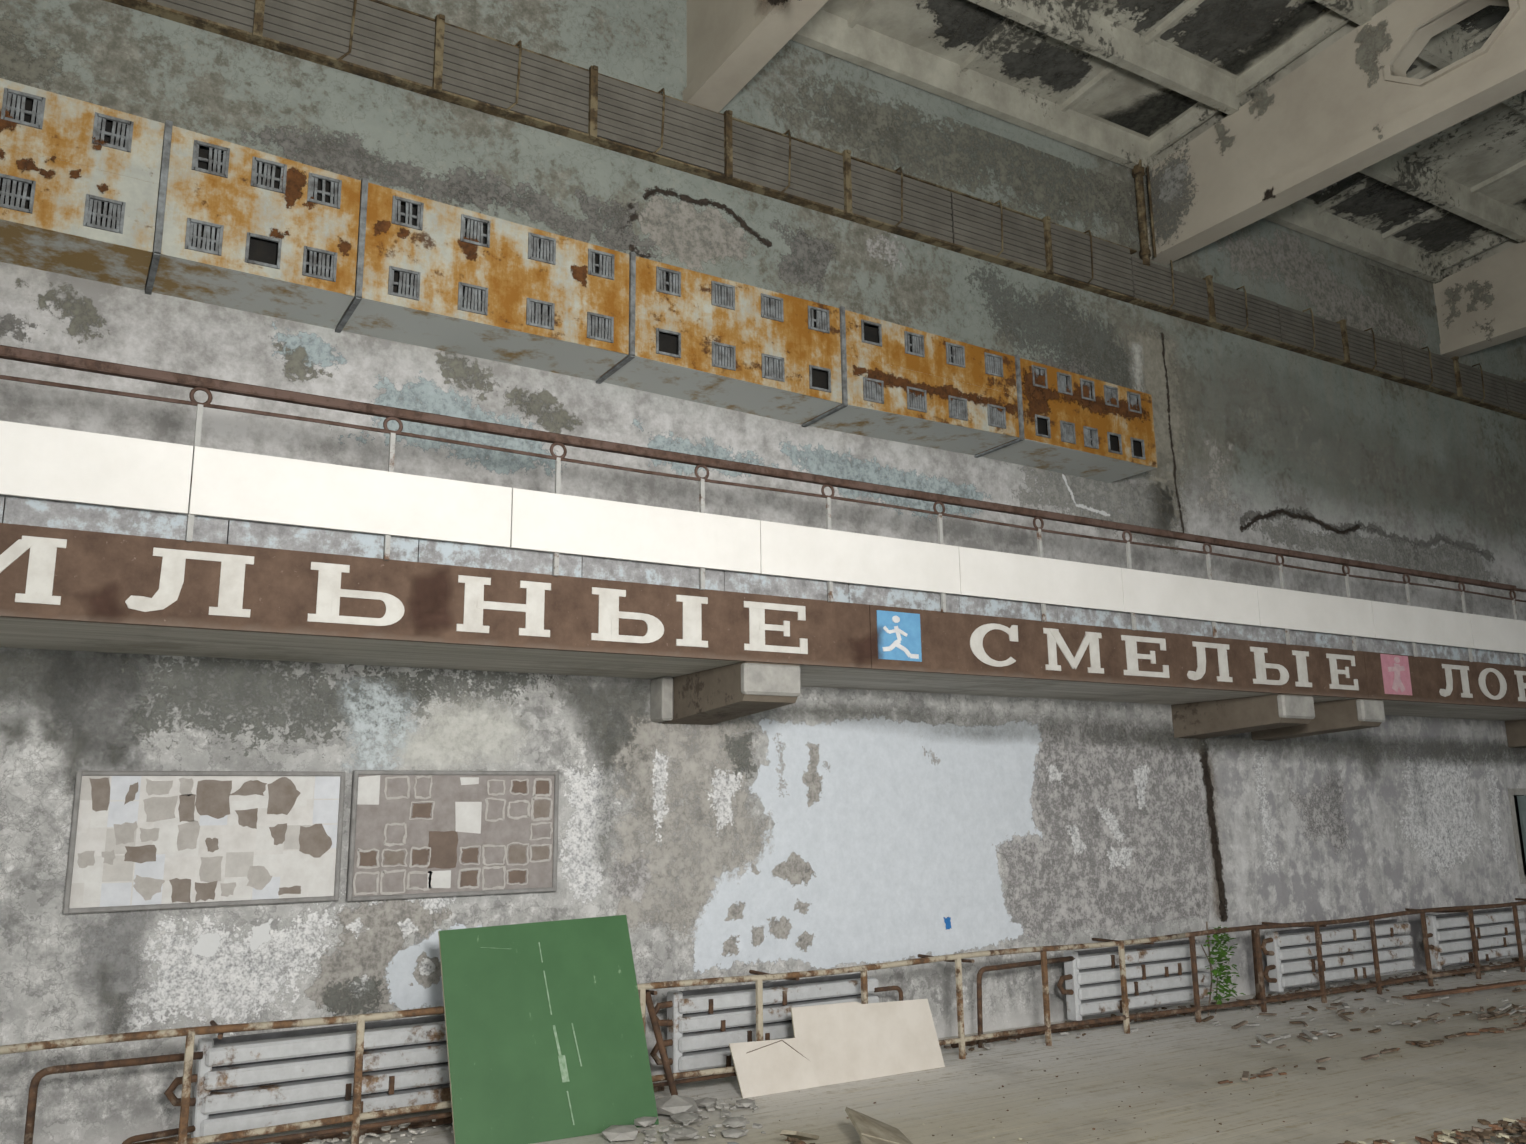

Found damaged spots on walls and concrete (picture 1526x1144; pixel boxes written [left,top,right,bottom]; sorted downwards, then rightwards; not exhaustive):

peeling [1456,5,1510,33]
peeling [1355,20,1393,87]
peeling [1249,82,1275,117]
corrosion [0,109,108,193]
peeling [1215,119,1235,154]
corrosion [280,167,317,210]
corrosion [269,228,290,239]
corrosion [337,236,352,257]
corrosion [853,365,1149,424]
peeling [707,729,757,836]
peeling [774,733,830,807]
peeling [722,852,816,956]